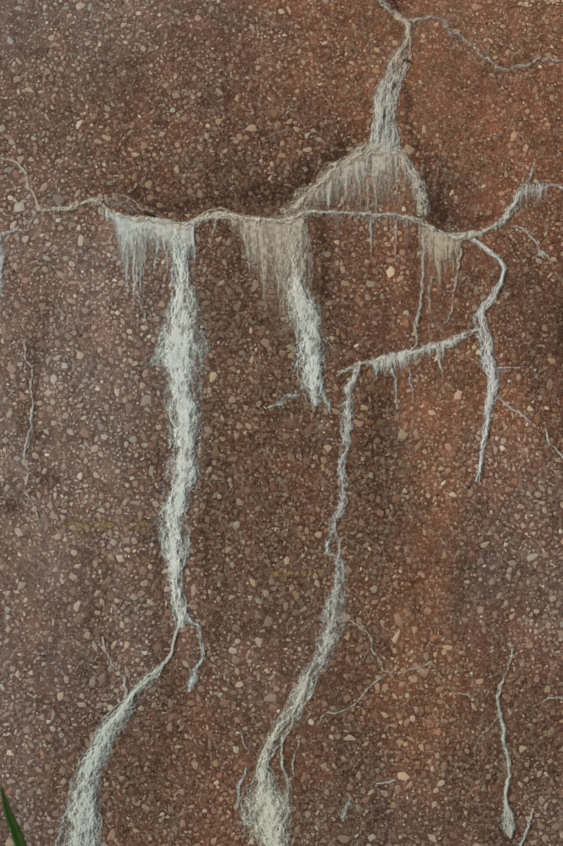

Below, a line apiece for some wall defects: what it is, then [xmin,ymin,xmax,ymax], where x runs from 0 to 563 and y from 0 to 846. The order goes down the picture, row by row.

crack [379,0,563,71]
crack [0,157,563,258]
crack [22,336,43,526]
damp [231,10,534,846]
crack [545,428,563,459]
damp [57,203,208,846]
crack [319,620,435,724]